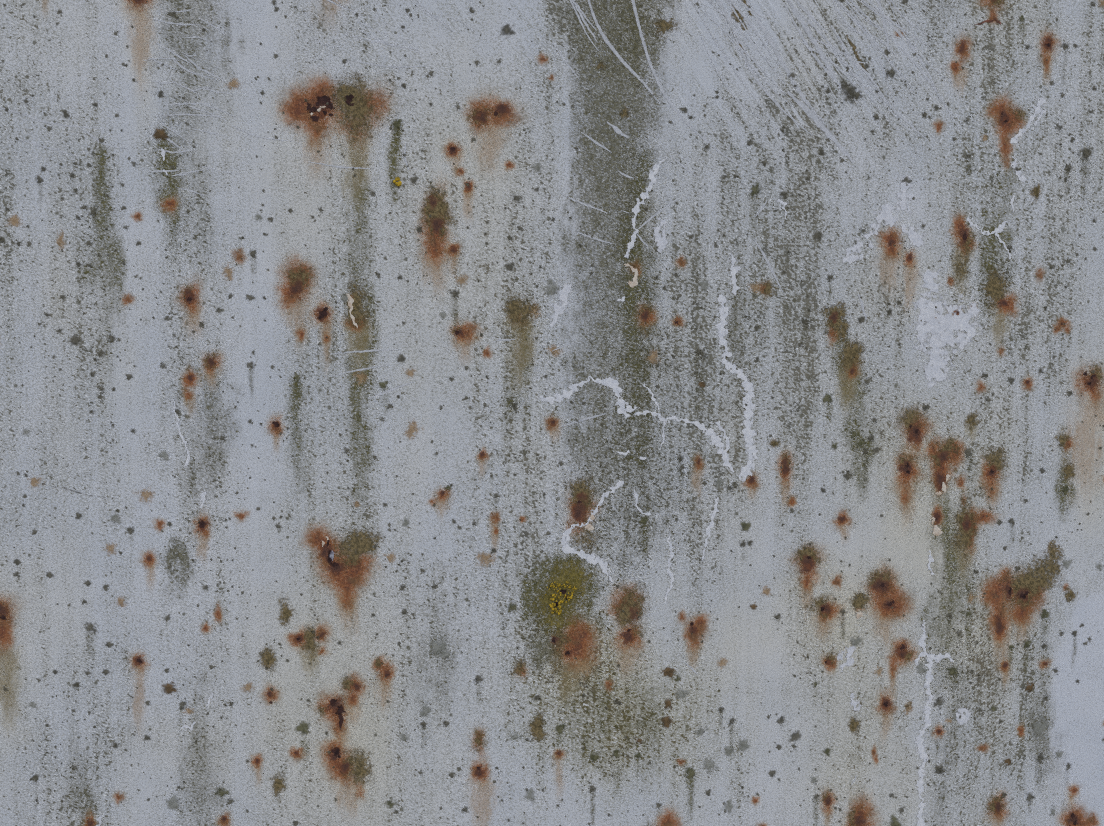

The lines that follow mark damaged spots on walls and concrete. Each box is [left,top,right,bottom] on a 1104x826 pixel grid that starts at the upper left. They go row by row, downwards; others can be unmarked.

rust [280,74,388,184]
rust [466,99,517,131]
rust [983,99,1026,167]
rust [420,187,460,265]
rust [897,407,995,567]
rust [306,528,395,610]
rust [796,542,838,623]
rust [850,569,911,619]
rust [968,540,1078,641]
rust [0,600,14,705]
rust [318,676,371,797]
rust [847,798,875,826]